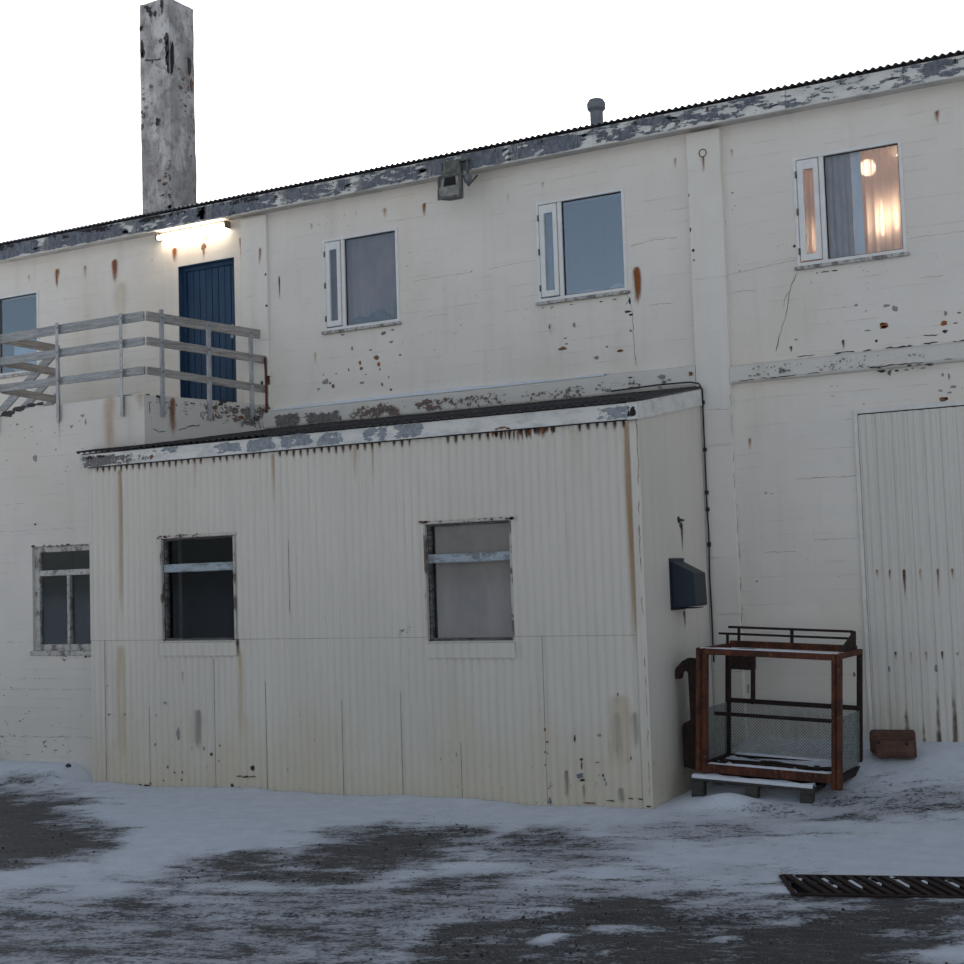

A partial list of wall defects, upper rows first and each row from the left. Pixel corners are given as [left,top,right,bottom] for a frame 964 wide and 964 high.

corrosion [633,267,641,300]
crack [710,260,964,426]
peeling [146,349,505,454]
peeling [521,377,640,401]
peeling [597,406,636,420]
peeling [80,446,178,468]